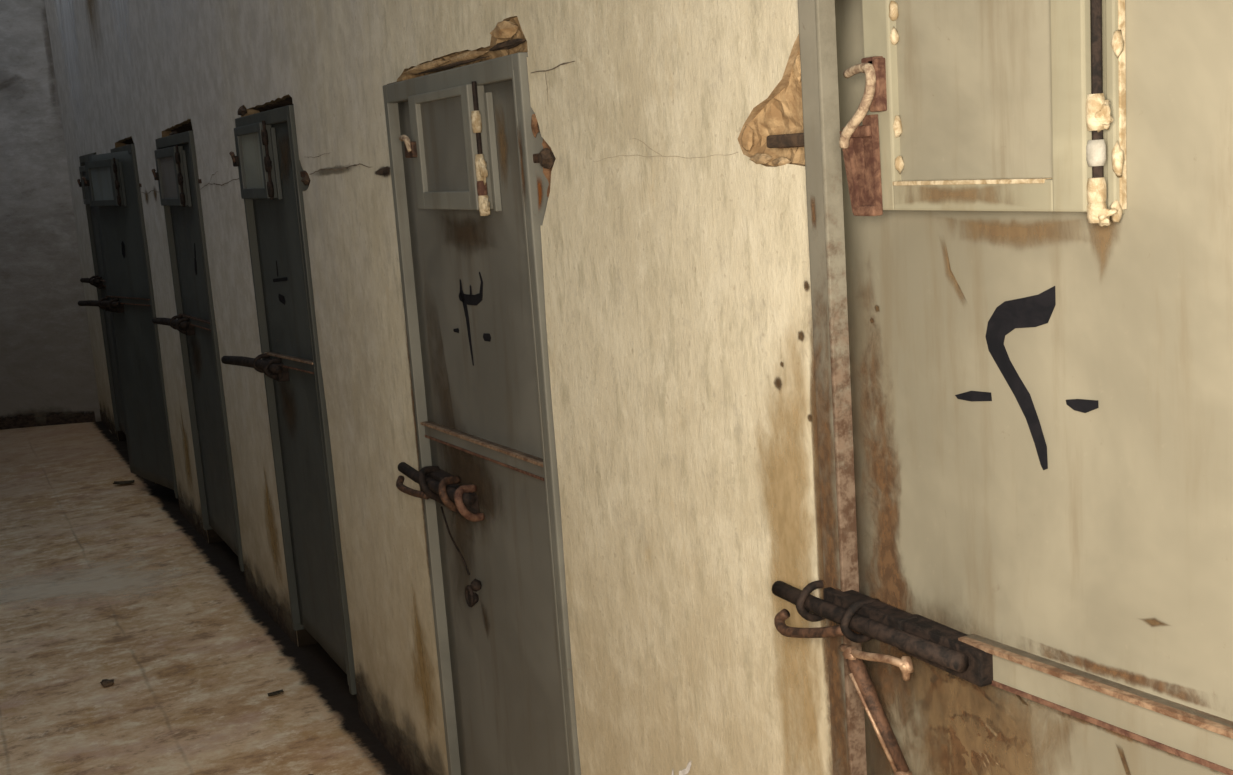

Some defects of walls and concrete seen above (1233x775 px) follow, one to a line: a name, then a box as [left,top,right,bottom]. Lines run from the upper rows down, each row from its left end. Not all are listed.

spalling [402,17,528,81]
crack [531,61,574,96]
spalling [742,47,805,166]
crack [309,153,370,175]
spalling [531,114,556,206]
leakage [0,405,118,440]
corrosion [813,346,839,590]
corrosion [825,620,850,775]